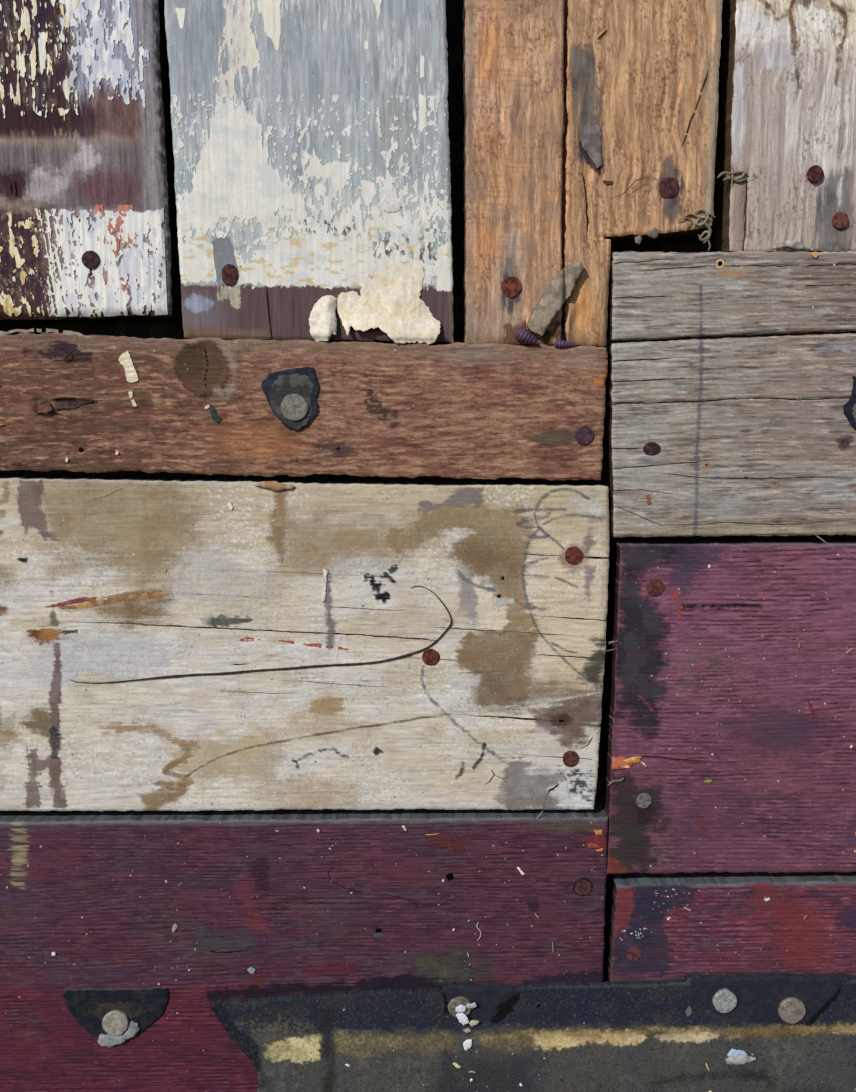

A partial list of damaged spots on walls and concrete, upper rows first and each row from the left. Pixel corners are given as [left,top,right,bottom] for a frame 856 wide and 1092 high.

peeling [0,0,149,121]
peeling [171,0,453,345]
peeling [732,62,747,163]
peeling [0,205,168,317]
leakage [267,490,723,747]